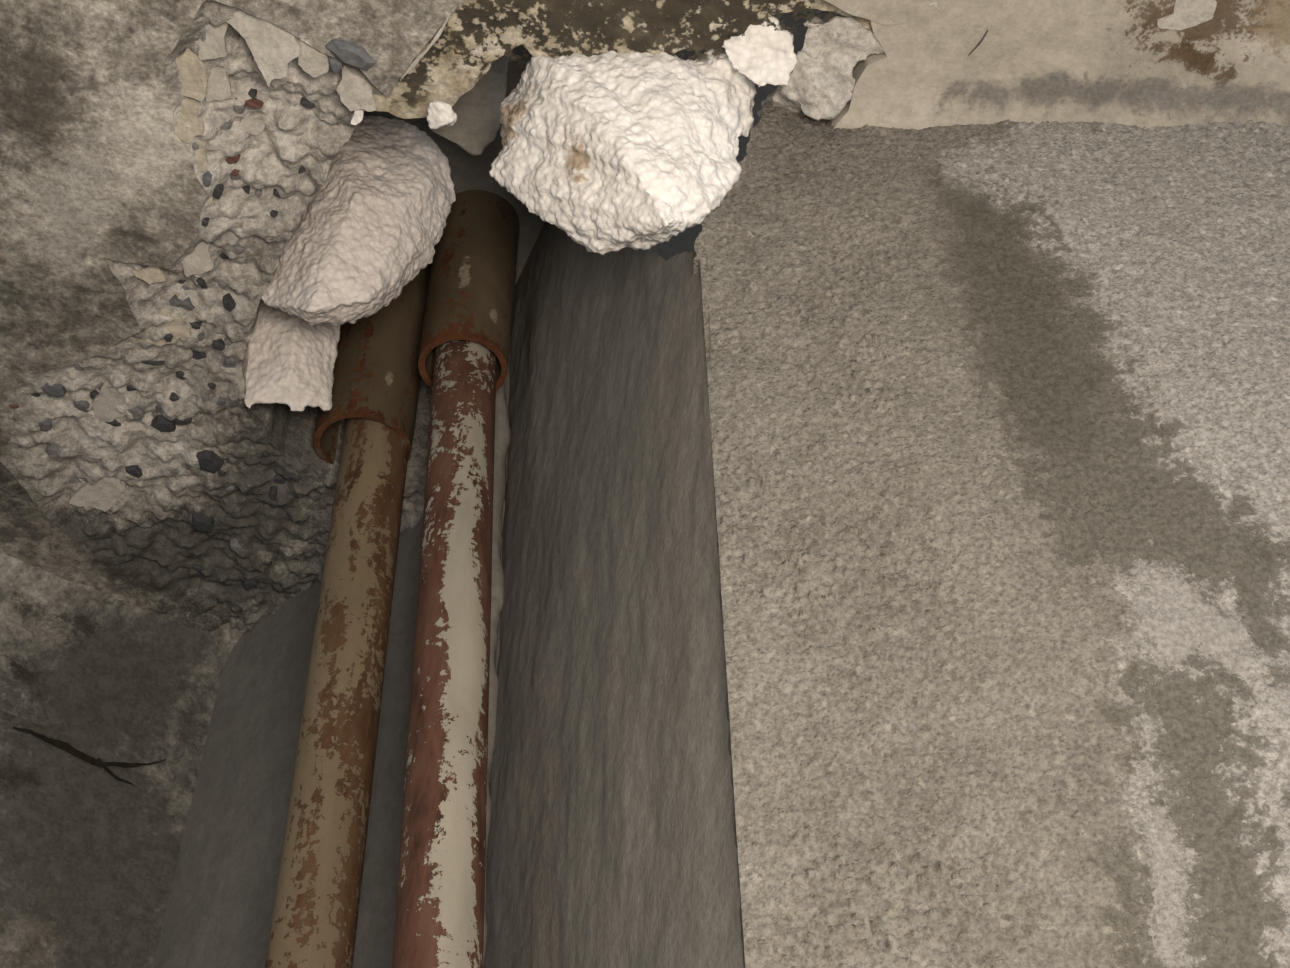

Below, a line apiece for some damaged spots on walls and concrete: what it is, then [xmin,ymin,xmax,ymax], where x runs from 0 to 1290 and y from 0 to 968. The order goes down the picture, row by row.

spalling [400,17,449,81]
peeling [825,0,938,25]
water stain [27,140,132,270]
spalling [0,0,386,632]
spalling [400,377,432,533]
water stain [959,167,1290,968]
crack [0,663,166,786]